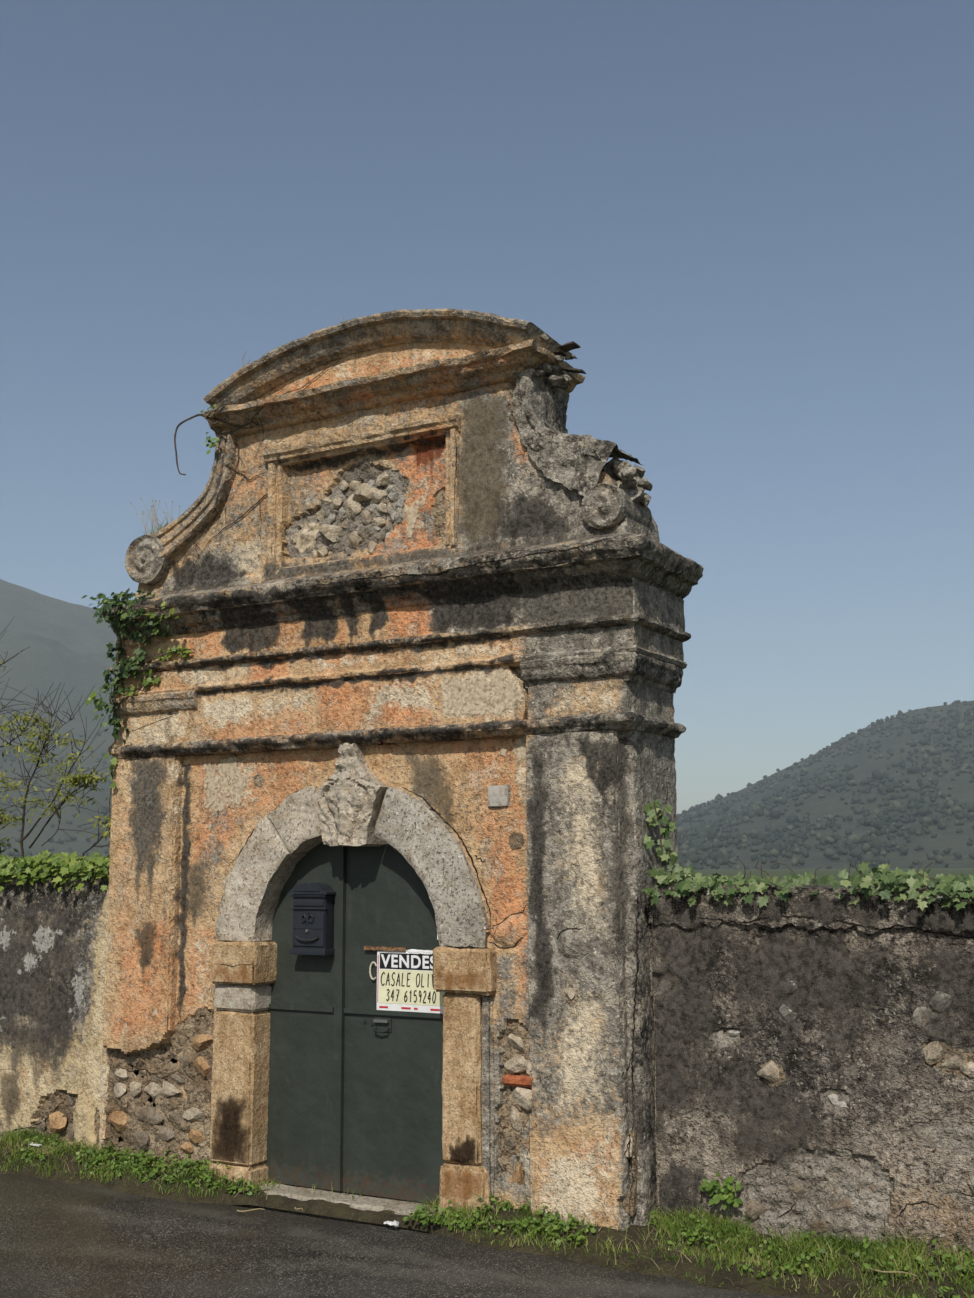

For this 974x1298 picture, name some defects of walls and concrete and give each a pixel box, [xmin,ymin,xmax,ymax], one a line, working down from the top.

spalling [508,333,574,422]
spalling [283,458,445,559]
water stain [114,397,633,697]
water stain [0,903,77,1061]
spalling [33,1007,214,1165]
water stain [212,1098,246,1163]
water stain [122,717,527,1009]
water stain [449,1135,478,1169]
spalling [497,1019,532,1185]
water stain [527,751,557,1038]
crack [621,897,640,1220]
crack [675,913,974,944]